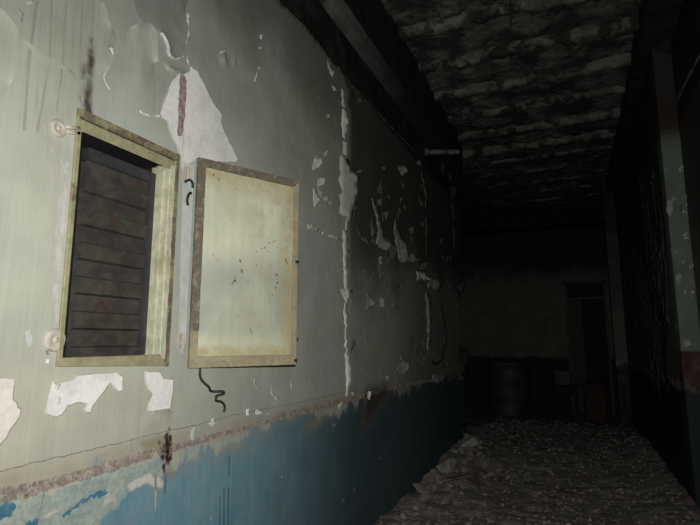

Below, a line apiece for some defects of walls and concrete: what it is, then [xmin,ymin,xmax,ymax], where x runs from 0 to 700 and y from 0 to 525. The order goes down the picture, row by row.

peeling [0,56,465,525]
corrosion [143,428,172,475]
crack [0,379,413,472]